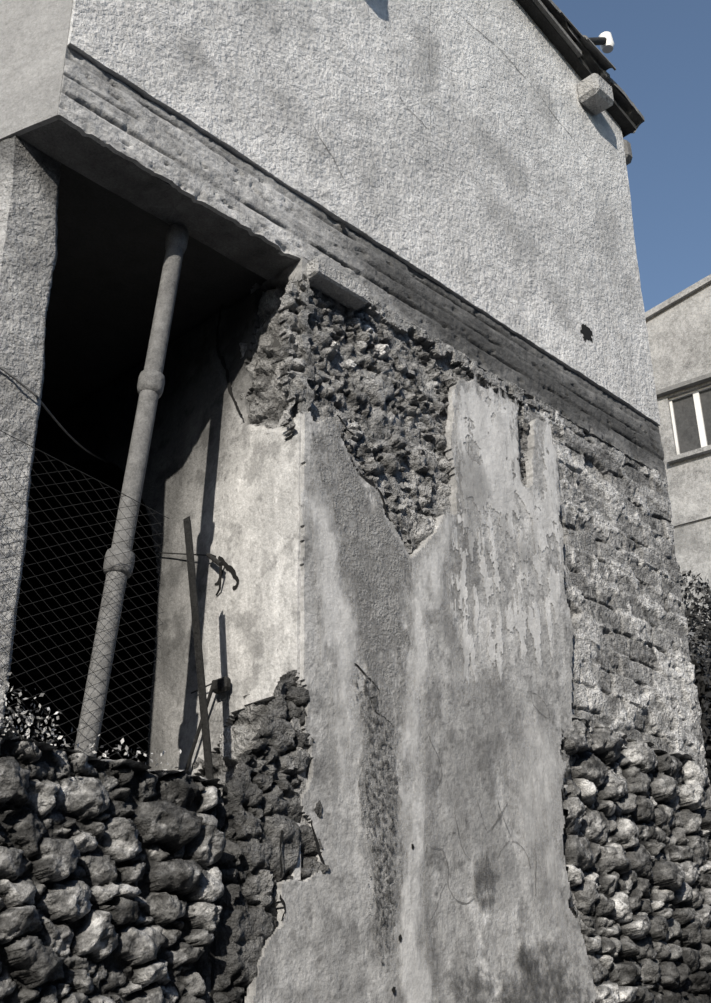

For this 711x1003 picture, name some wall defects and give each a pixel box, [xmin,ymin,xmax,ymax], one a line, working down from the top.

crack [400,7,524,154]
spalling [580,324,593,342]
spalling [239,276,569,964]
spalling [192,670,329,1003]
crack [430,808,475,921]
crack [499,838,537,895]